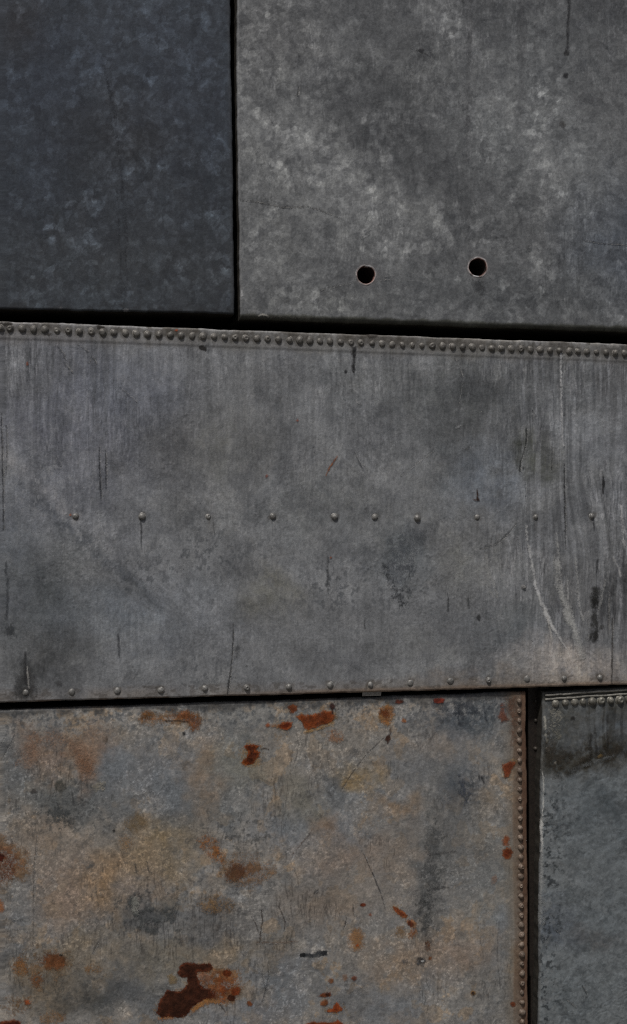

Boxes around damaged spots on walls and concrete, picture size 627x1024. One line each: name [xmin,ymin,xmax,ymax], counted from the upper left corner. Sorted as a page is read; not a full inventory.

corrosion [138,709,202,730]
corrosion [266,703,342,743]
corrosion [242,742,269,765]
corrosion [502,759,515,778]
corrosion [502,836,513,859]
corrosion [393,907,417,938]
corrosion [154,962,252,1019]
corrosion [307,975,357,1024]